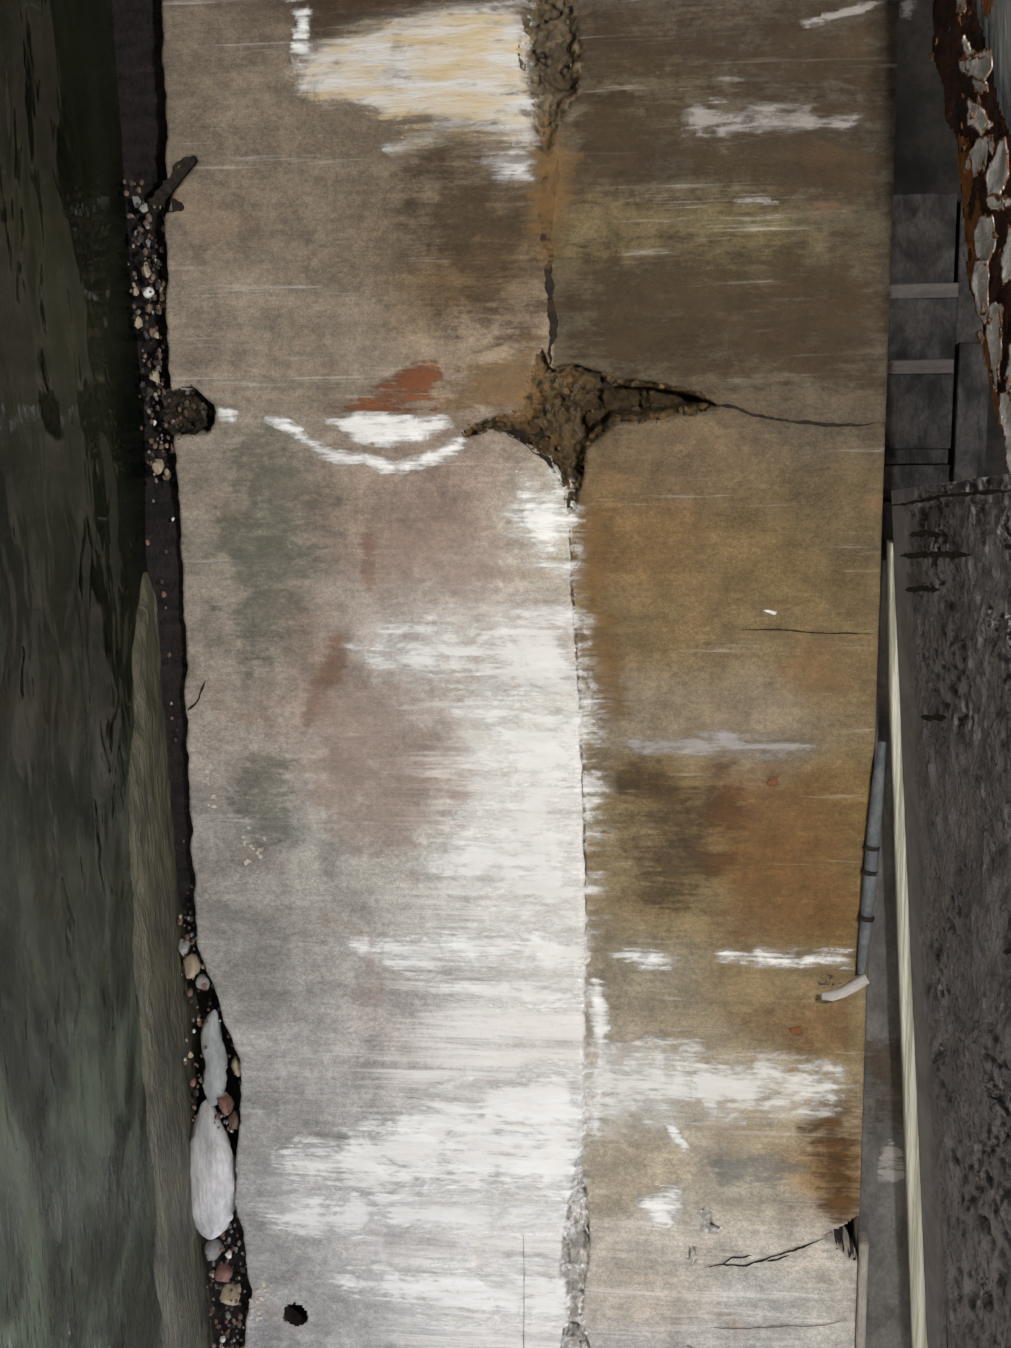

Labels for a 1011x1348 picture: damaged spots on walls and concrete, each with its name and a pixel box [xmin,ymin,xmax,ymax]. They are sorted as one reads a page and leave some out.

peeling [899,0,916,19]
corrosion [340,360,443,414]
spalling [462,343,718,514]
leakage [294,0,891,323]
leakage [568,237,890,387]
crack [703,400,883,427]
peeling [927,0,1011,474]
corrosion [932,0,1011,444]
leakage [265,473,851,1239]
leakage [327,1255,584,1328]
crack [704,1238,824,1268]